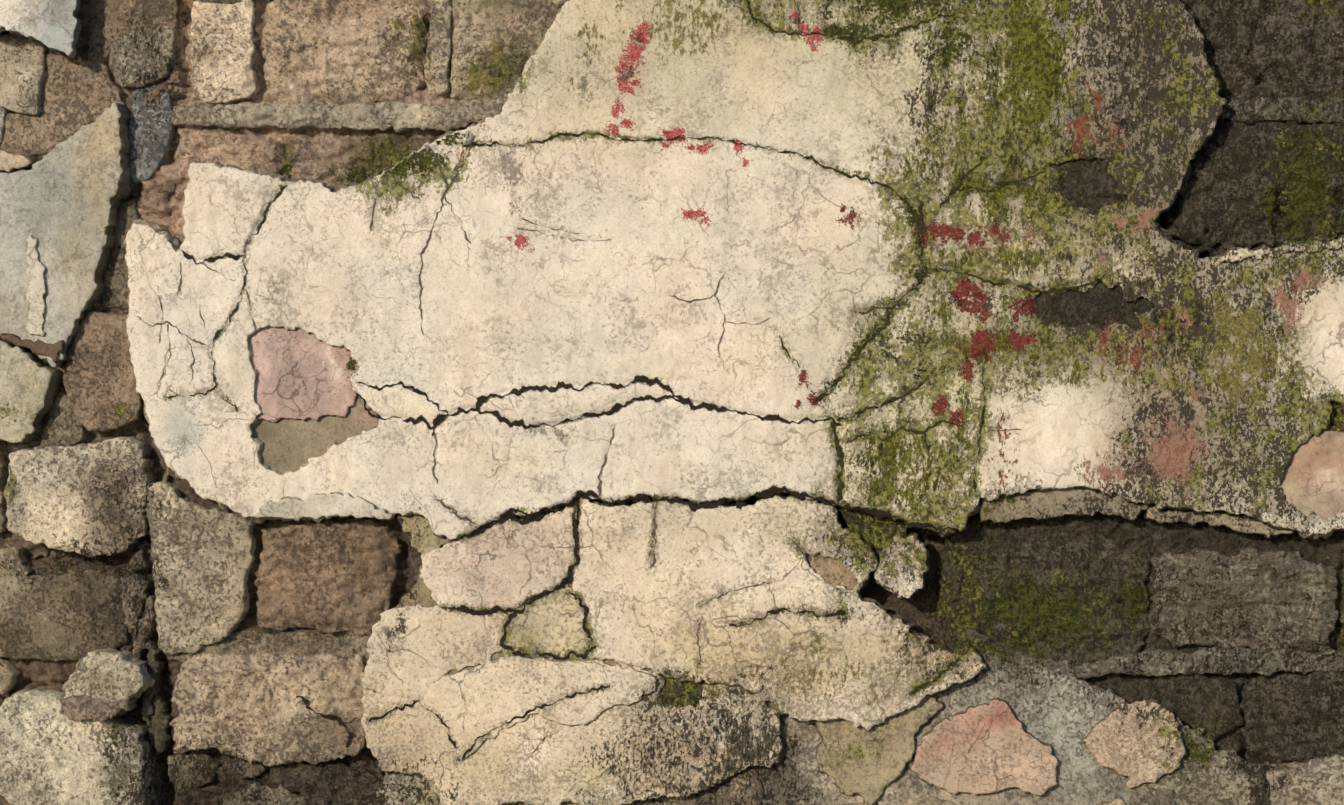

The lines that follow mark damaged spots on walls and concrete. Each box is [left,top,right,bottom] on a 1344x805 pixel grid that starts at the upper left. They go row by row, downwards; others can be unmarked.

peeling [0,0,97,60]
leakage [798,11,875,48]
leakage [900,18,1038,184]
leakage [1091,1,1203,182]
crack [135,185,287,412]
leakage [870,244,1077,450]
leakage [1101,268,1174,321]
spalling [227,492,422,654]
crack [296,132,1104,761]
spalling [936,401,1344,654]
peeling [421,583,708,760]
spalling [748,657,1344,805]